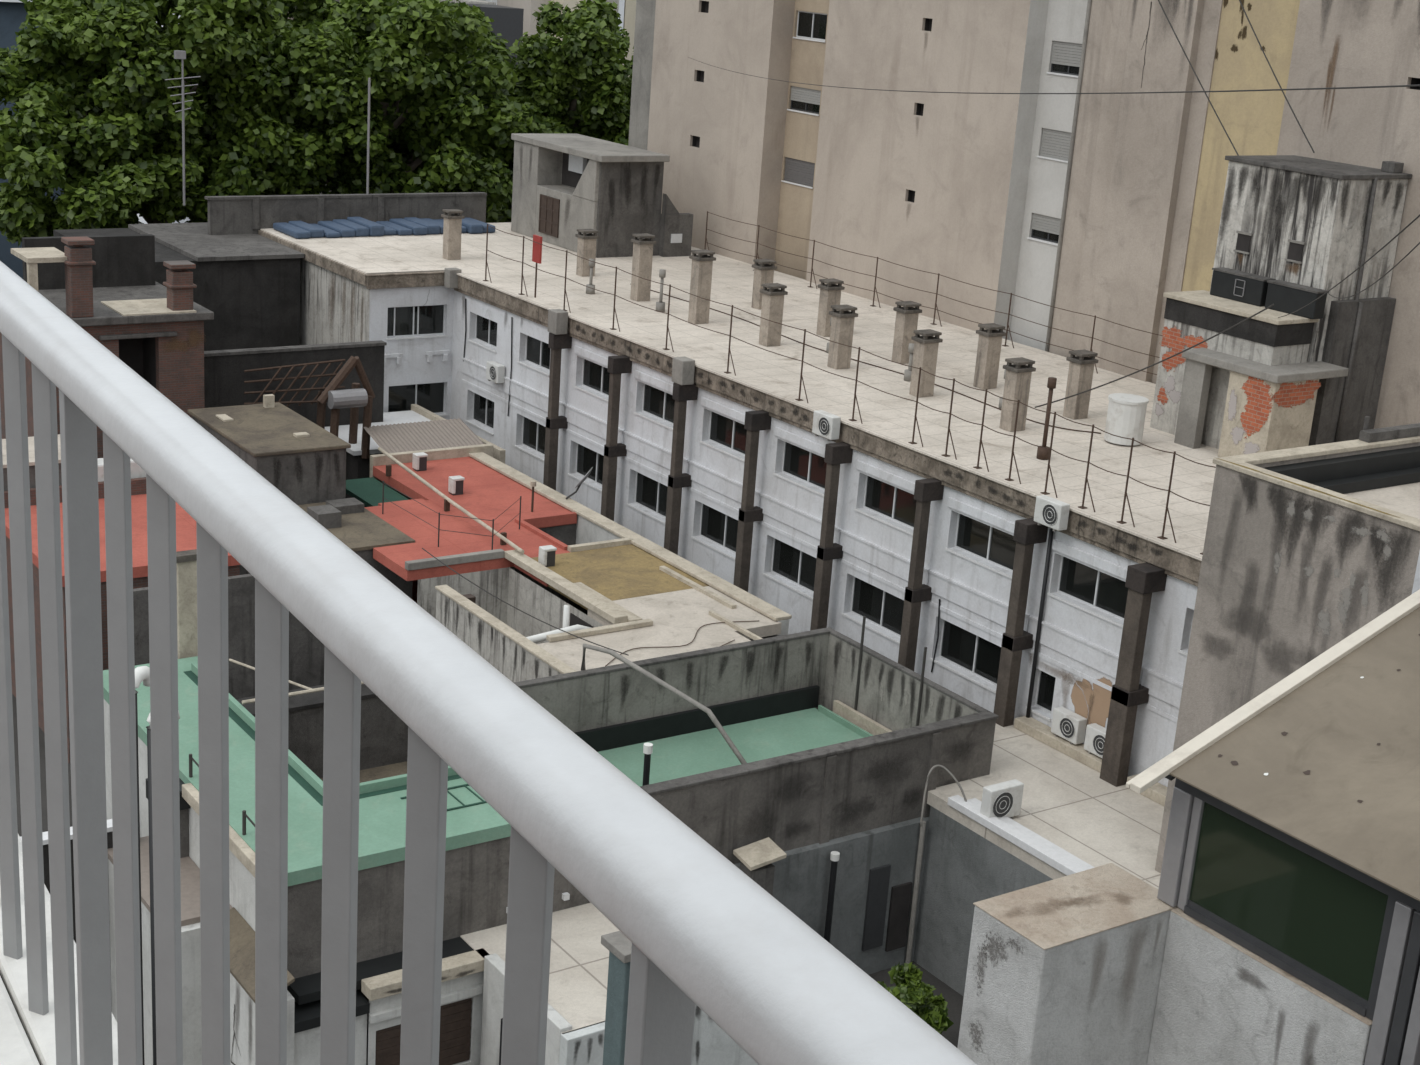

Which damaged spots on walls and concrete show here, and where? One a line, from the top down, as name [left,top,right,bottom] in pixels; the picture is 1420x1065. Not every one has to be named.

leakage [1220,168,1349,244]
leakage [1363,182,1402,231]
flaking render [1157,325,1208,405]
flaking render [1228,376,1321,454]
leakage [1233,476,1330,605]
leakage [1340,514,1410,597]
leakage [834,644,960,722]
leakage [975,932,1023,995]